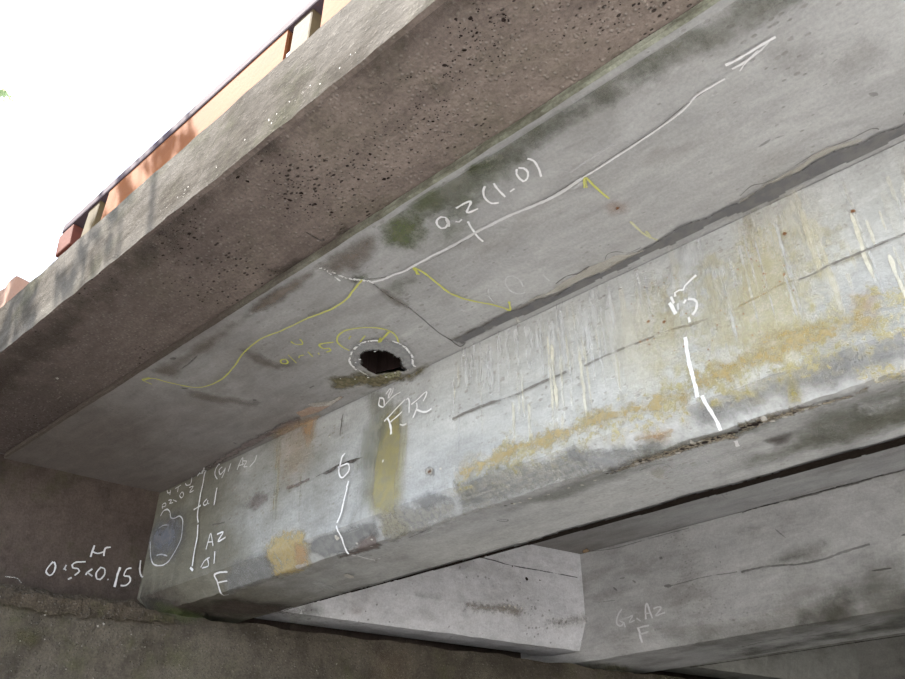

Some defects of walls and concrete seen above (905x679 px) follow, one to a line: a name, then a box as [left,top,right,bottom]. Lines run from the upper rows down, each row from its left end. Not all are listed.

crack [538,89,709,203]
damp [254,274,312,311]
crack [276,261,301,274]
damp [325,240,372,273]
crack [364,232,479,347]
damp [527,290,597,410]
damp [362,396,388,463]
spalling [381,364,905,542]
damp [795,391,905,449]
corrosion [264,530,310,577]
damp [140,437,905,615]